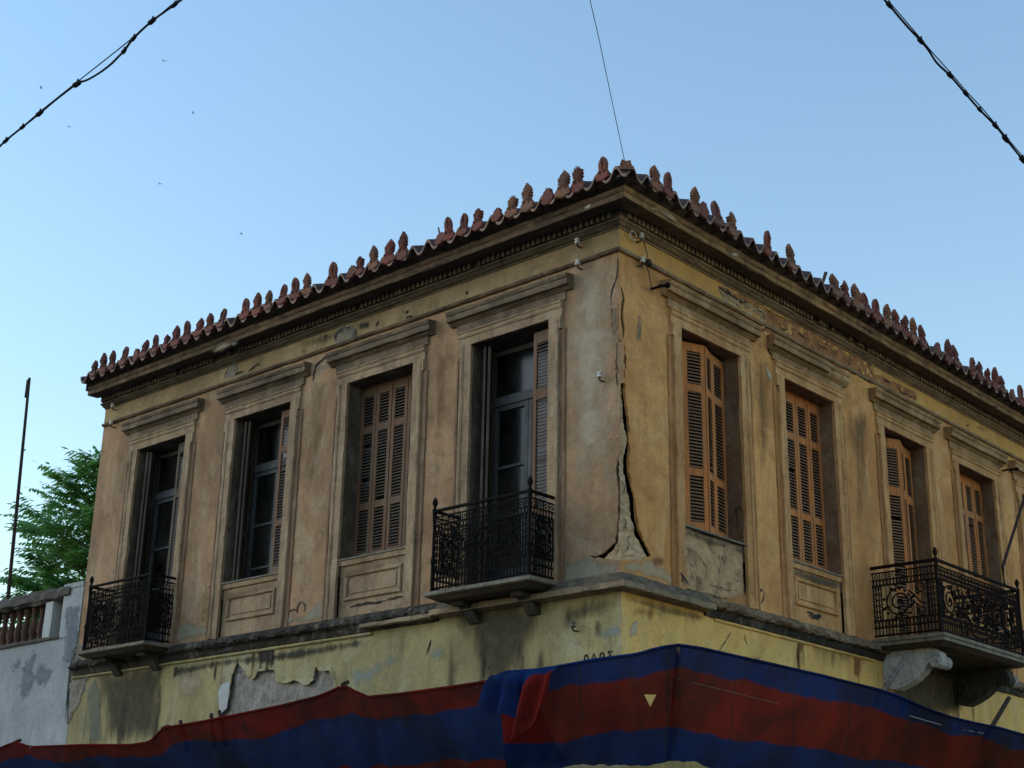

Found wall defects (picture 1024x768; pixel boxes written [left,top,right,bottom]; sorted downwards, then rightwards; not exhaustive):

spalling [598,383,648,560]
spalling [686,531,745,599]
water stain [83,641,357,744]
peeling [218,662,338,716]